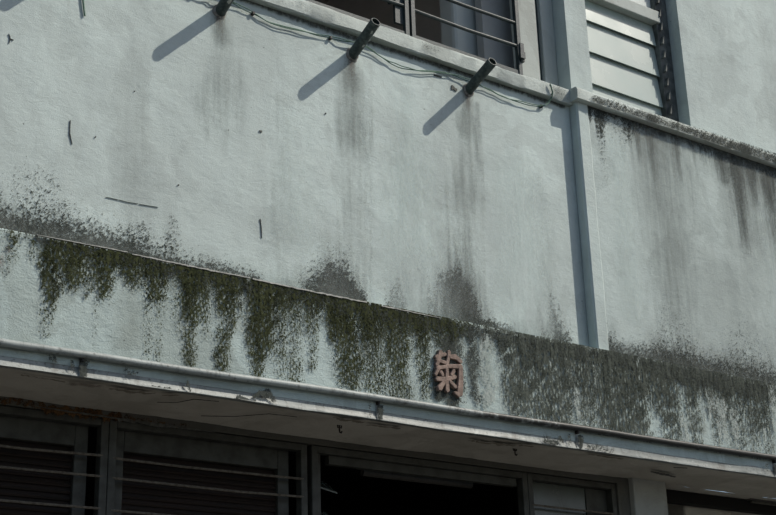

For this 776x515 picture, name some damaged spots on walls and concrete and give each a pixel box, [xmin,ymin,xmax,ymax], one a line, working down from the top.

water stain [0,156,776,472]
water stain [587,95,776,235]